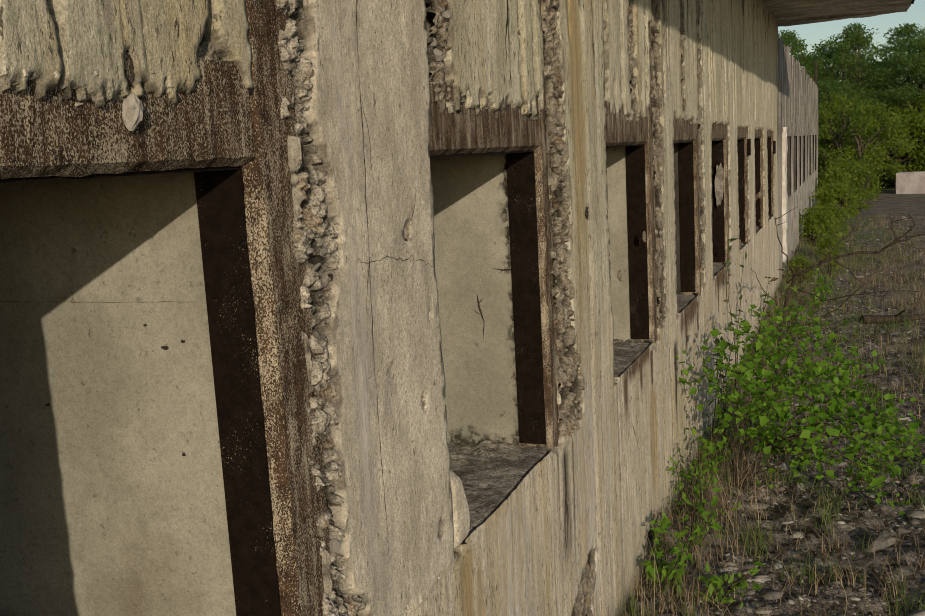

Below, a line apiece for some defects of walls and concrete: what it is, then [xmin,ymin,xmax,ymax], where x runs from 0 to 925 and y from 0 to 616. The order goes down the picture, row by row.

spalling [124,50,140,86]
spalling [196,32,226,61]
spalling [424,0,455,106]
spalling [628,0,638,111]
spalling [541,0,585,438]
spalling [642,0,668,327]
spalling [276,0,366,616]
crack [356,83,435,559]
damp [558,421,603,572]
spalling [571,548,596,616]